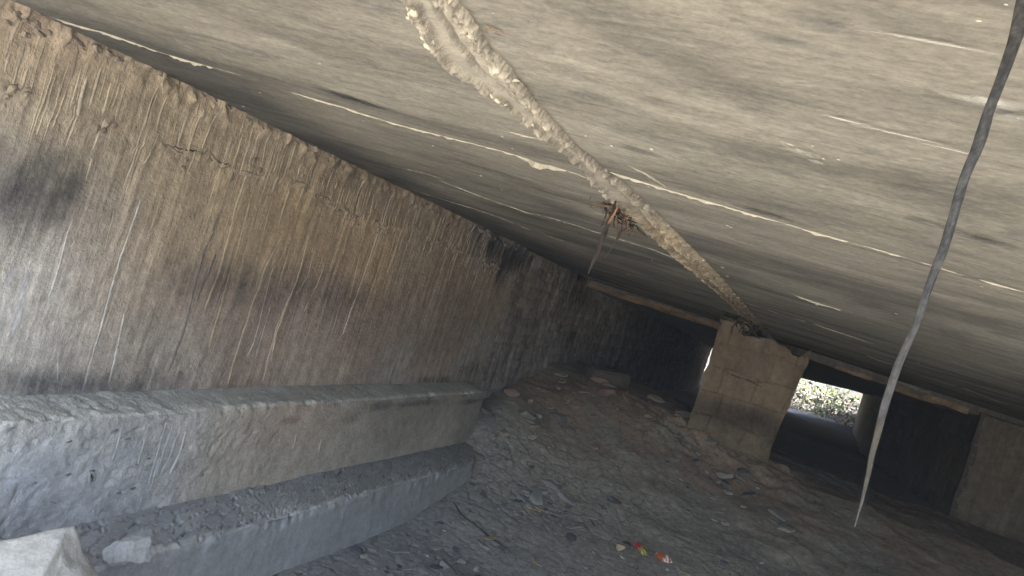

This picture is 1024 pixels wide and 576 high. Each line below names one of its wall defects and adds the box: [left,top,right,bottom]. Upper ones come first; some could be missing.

damp [4,17,134,180]
damp [123,81,168,194]
damp [48,217,74,299]
damp [77,198,141,392]
damp [168,122,525,383]